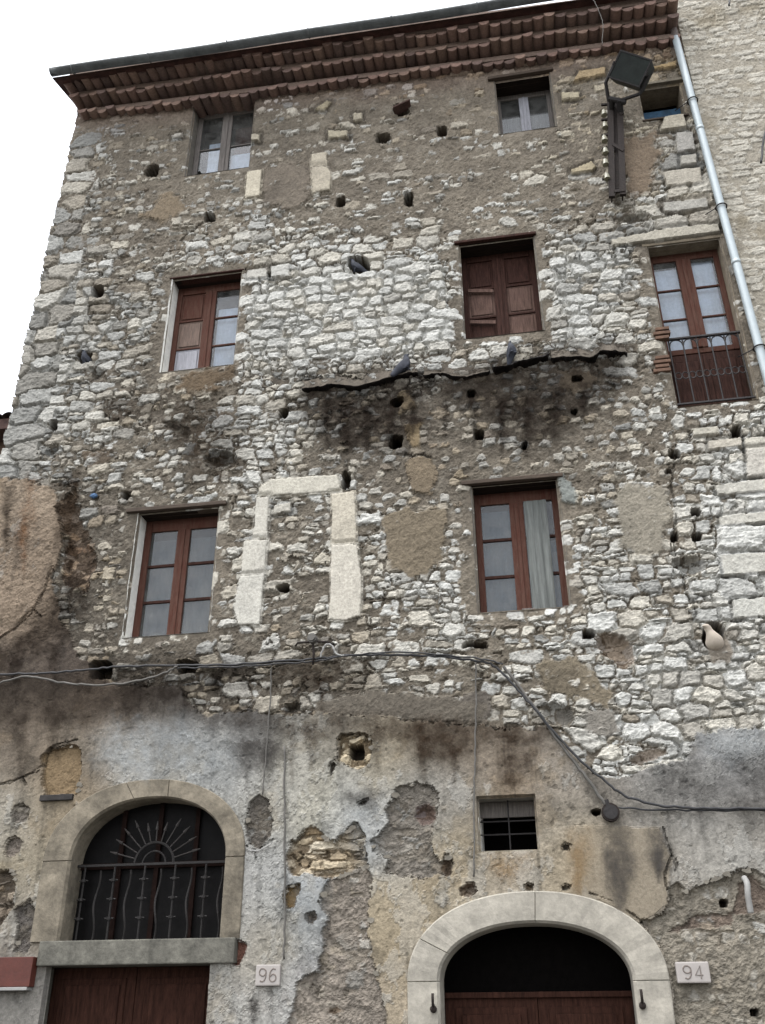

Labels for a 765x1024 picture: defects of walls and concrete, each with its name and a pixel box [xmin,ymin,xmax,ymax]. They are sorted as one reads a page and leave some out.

leakage [299,372,435,447]
leakage [444,345,623,449]
spalling [330,731,374,776]
spalling [246,794,274,848]
spalling [0,802,36,954]
peeling [283,781,453,1024]